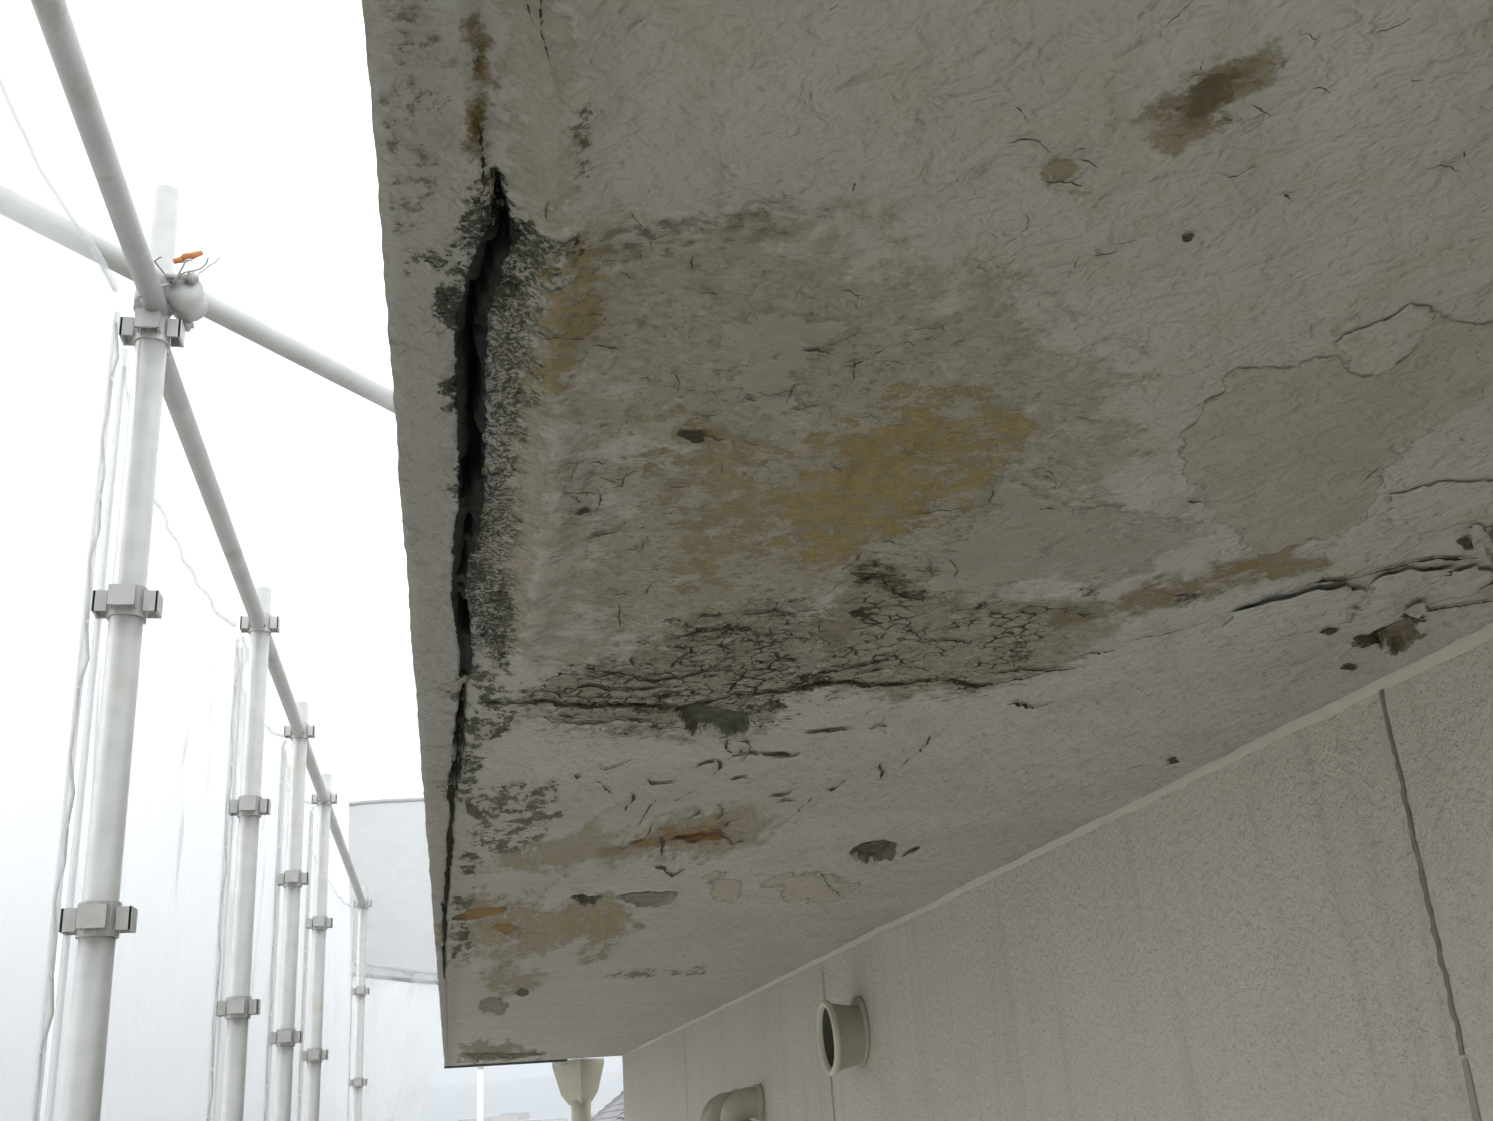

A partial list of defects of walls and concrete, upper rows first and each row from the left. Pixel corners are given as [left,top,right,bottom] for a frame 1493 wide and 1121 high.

crack [526,0,550,63]
damp [381,0,834,1014]
crack [441,124,1125,954]
damp [620,381,1054,625]
crack [1174,593,1201,602]
peeling [1129,524,1493,670]